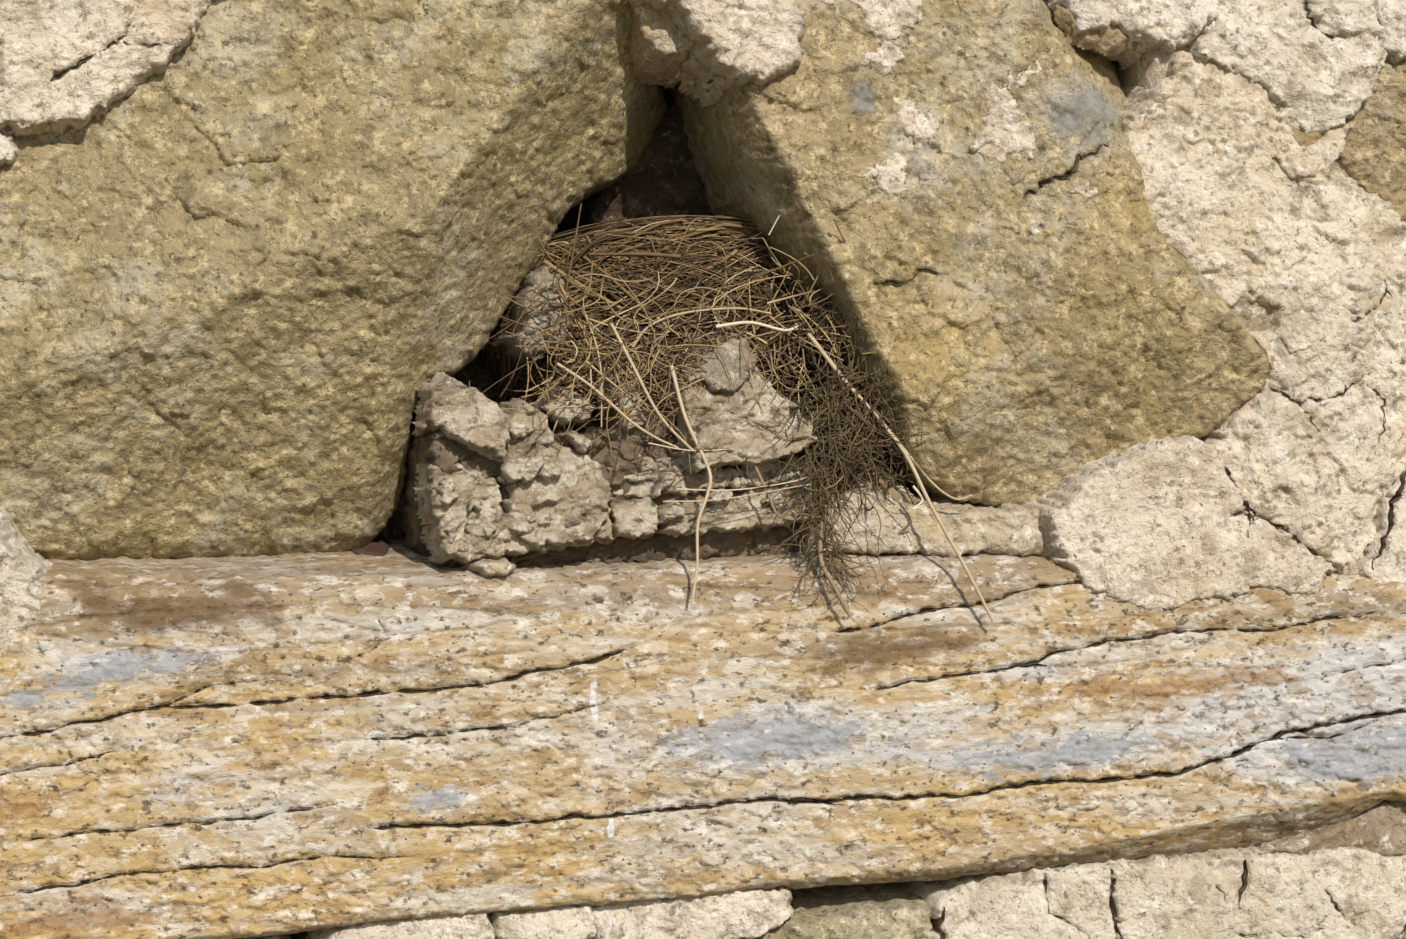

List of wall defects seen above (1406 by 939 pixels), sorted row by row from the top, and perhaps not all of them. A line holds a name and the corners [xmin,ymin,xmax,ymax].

crack [47,6,182,85]
crack [1305,0,1384,41]
crack [1352,278,1401,331]
crack [1270,356,1406,569]
crack [1217,452,1321,556]
crack [874,612,1373,691]
crack [0,649,626,775]
crack [26,710,1406,893]
crack [932,906,945,939]
crack [1044,869,1125,939]